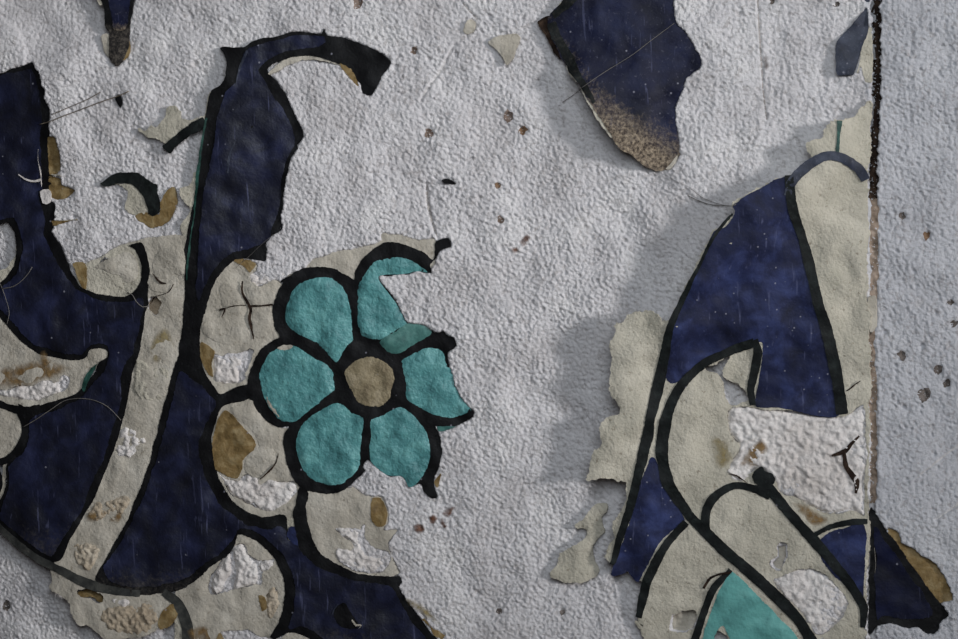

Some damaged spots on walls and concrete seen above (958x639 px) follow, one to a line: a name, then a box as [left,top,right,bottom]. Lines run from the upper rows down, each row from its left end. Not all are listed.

peeling [97,0,135,66]
peeling [488,34,521,65]
peeling [537,0,701,171]
crack [868,0,882,297]
peeling [0,29,474,639]
peeling [550,101,953,639]
crack [831,330,878,503]